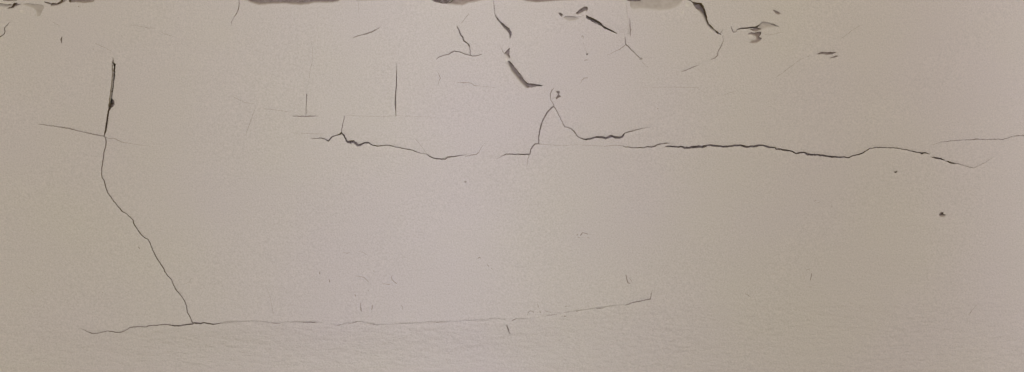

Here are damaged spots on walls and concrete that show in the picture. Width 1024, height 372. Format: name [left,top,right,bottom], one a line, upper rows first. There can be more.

peeling [525,0,641,35]
crack [234,0,1024,168]
spalling [731,10,781,44]
crack [39,43,220,334]